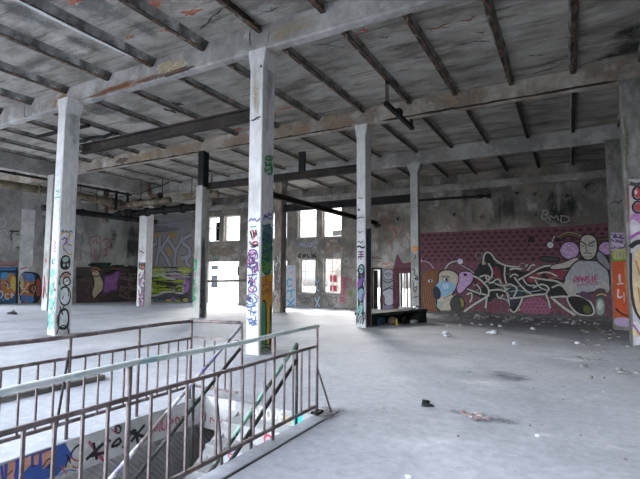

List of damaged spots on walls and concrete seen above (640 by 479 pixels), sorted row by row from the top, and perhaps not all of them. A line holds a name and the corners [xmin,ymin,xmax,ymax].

crack [199,7,223,30]
rust [79,74,160,101]